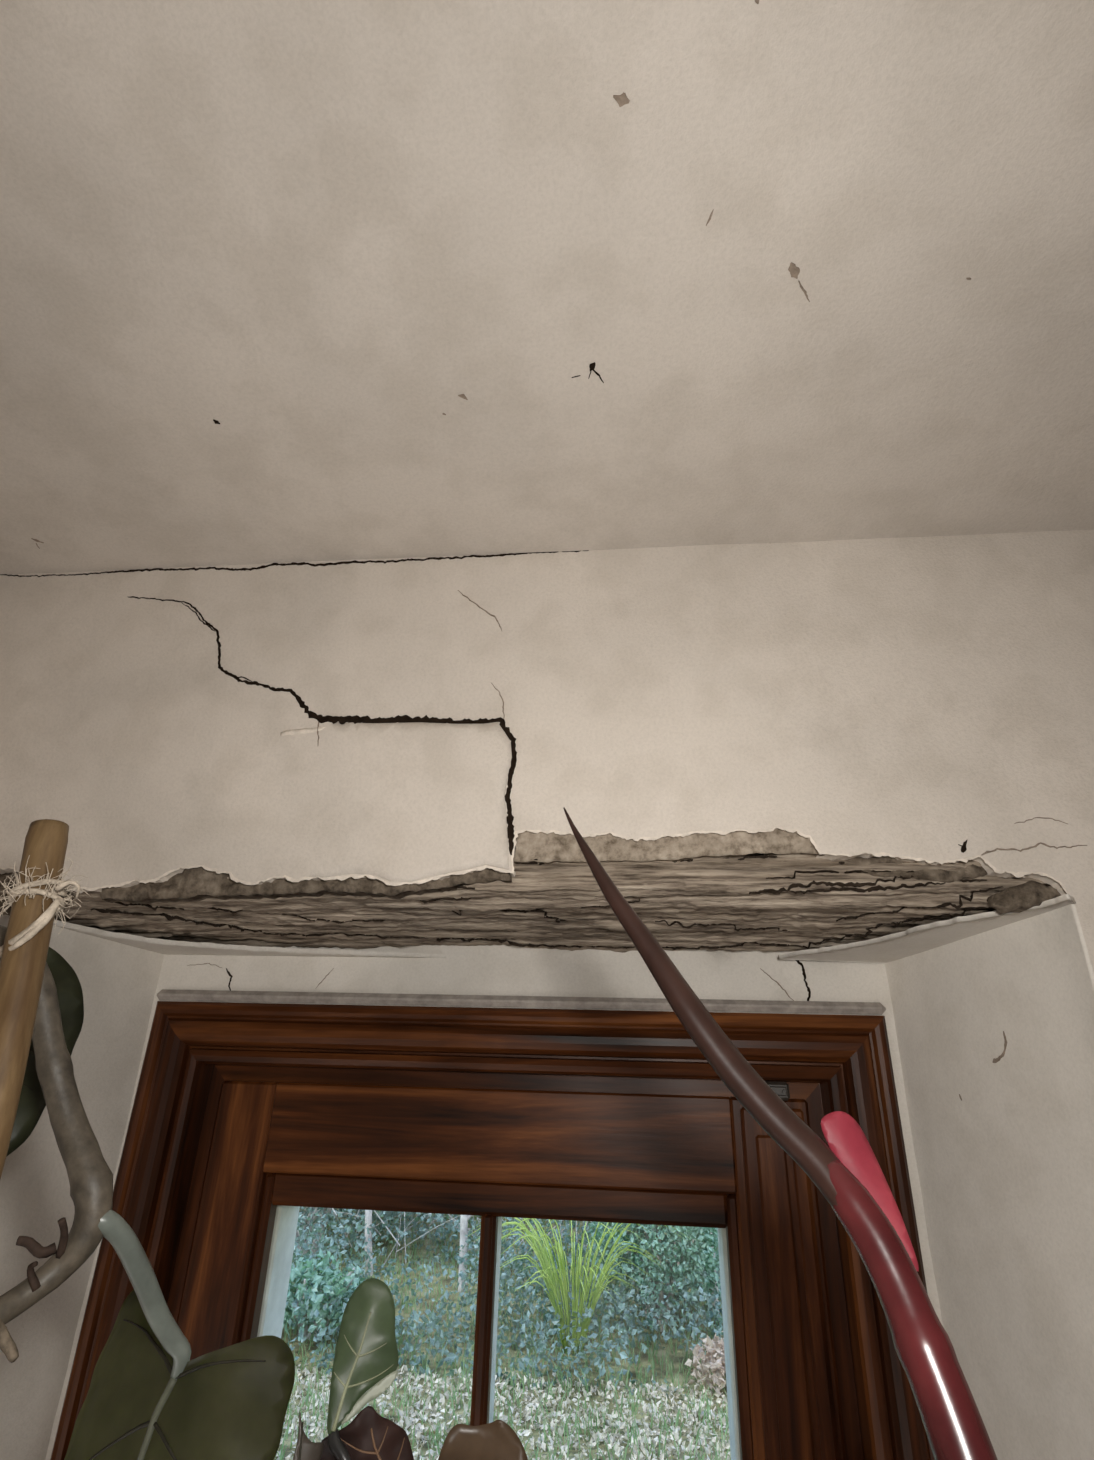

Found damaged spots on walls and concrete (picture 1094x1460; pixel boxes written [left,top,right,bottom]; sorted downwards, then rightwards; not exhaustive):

crack [0,550,589,855]
flaking render [0,867,19,916]
flaking render [54,827,1070,953]